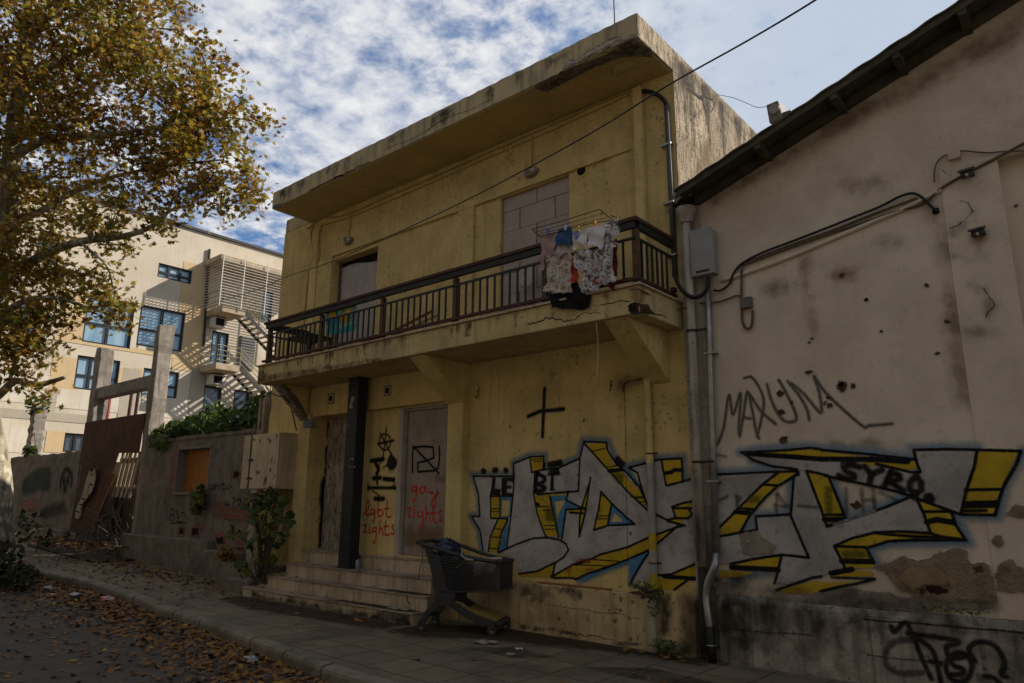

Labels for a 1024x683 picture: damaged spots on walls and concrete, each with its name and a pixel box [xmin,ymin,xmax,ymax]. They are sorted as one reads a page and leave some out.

spalling [534,33,653,92]
leakage [678,64,741,144]
crack [528,300,630,325]
flaking render [782,547,1024,611]